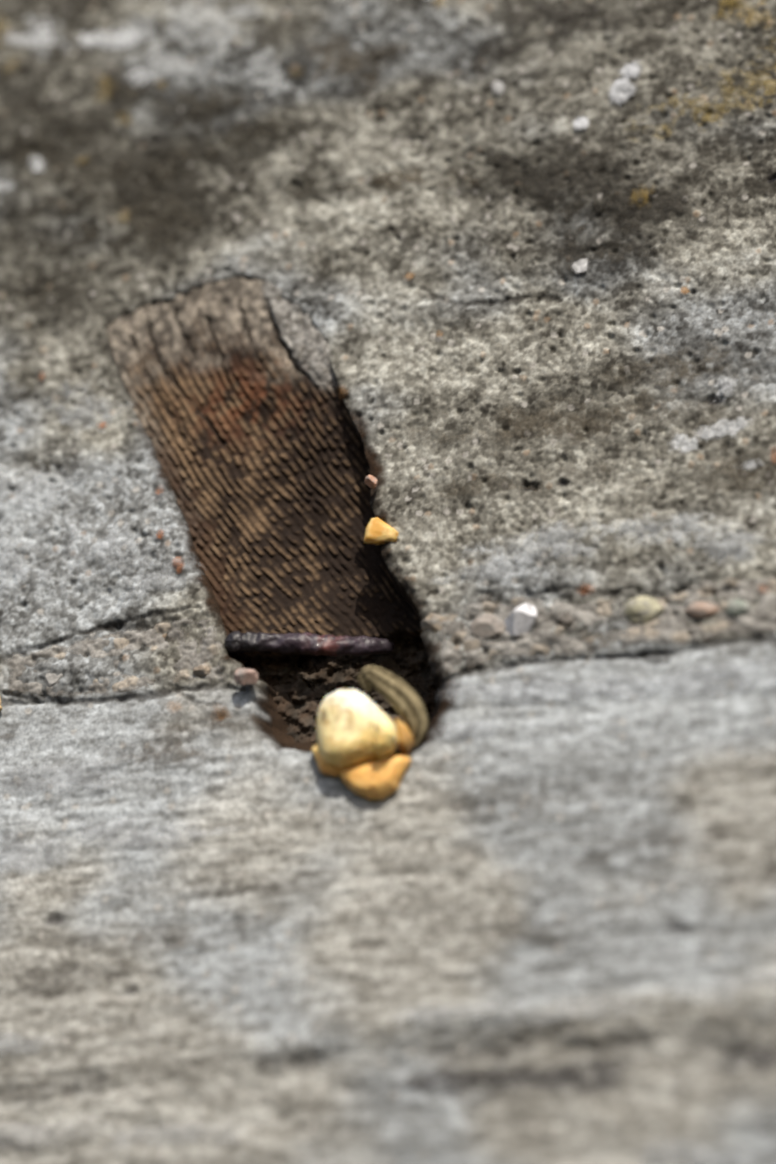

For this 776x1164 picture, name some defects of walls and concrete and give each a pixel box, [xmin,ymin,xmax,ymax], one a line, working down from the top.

spalling [8,619,223,696]